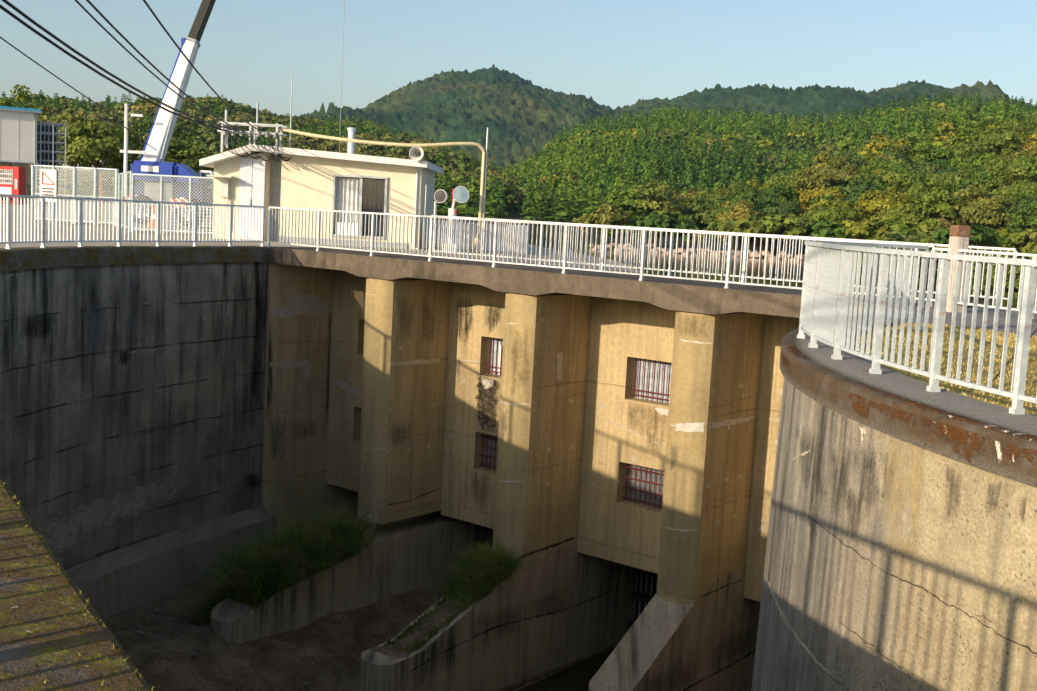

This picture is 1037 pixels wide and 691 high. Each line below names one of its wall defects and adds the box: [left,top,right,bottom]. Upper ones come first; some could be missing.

leakage [250,291,272,407]
corrosion [849,383,1037,462]
crack [810,517,1037,657]